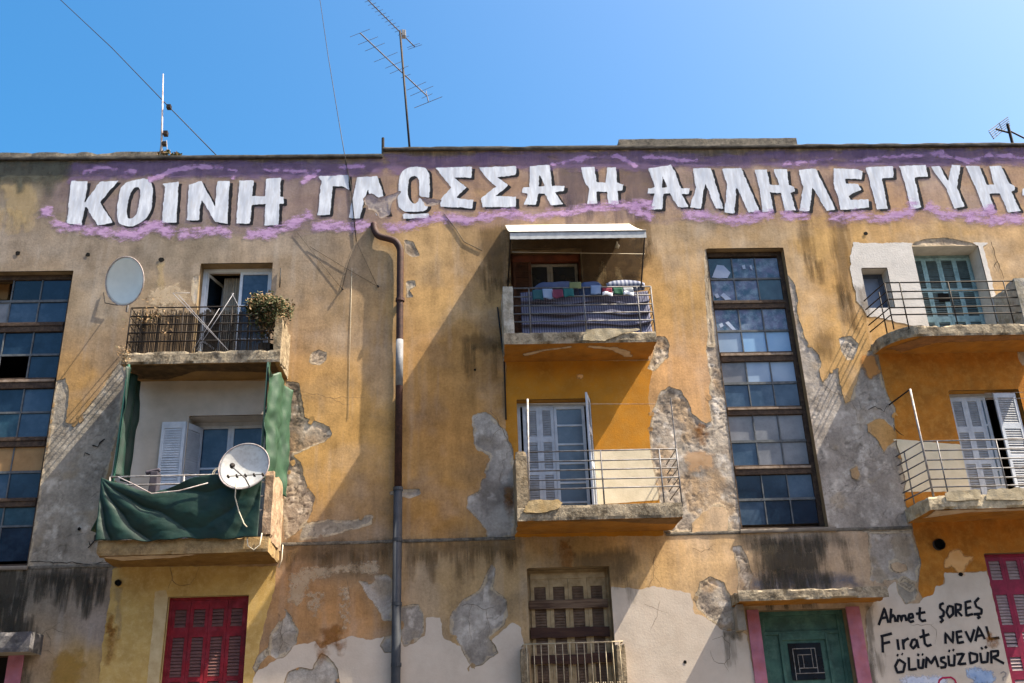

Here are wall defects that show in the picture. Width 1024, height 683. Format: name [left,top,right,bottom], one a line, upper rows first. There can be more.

spalling [466,249,741,537]